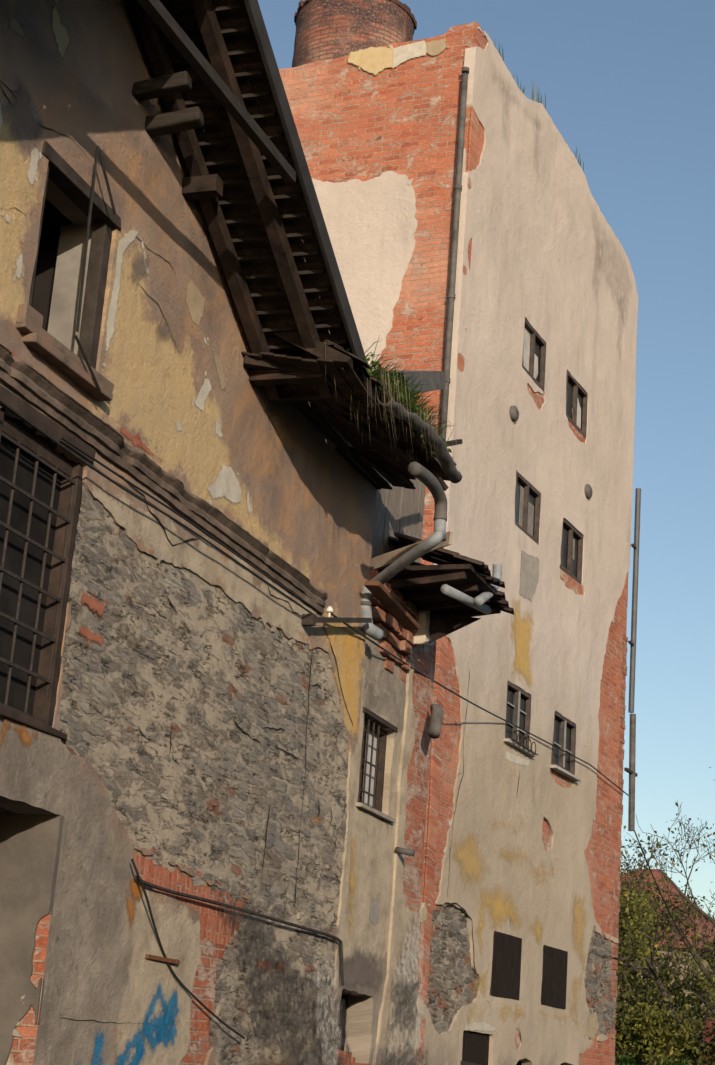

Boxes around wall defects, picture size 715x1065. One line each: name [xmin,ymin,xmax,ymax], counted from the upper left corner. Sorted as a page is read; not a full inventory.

flaking render [27,147,42,185]
crack [0,80,87,156]
flaking render [279,21,487,372]
flaking render [102,218,149,367]
flaking render [415,389,443,435]
flaking render [208,465,252,519]
flaking render [422,486,435,540]
flaking render [56,481,349,1065]
flaking render [403,636,495,1065]
flaking render [579,571,629,1065]
flaking render [6,911,51,1065]